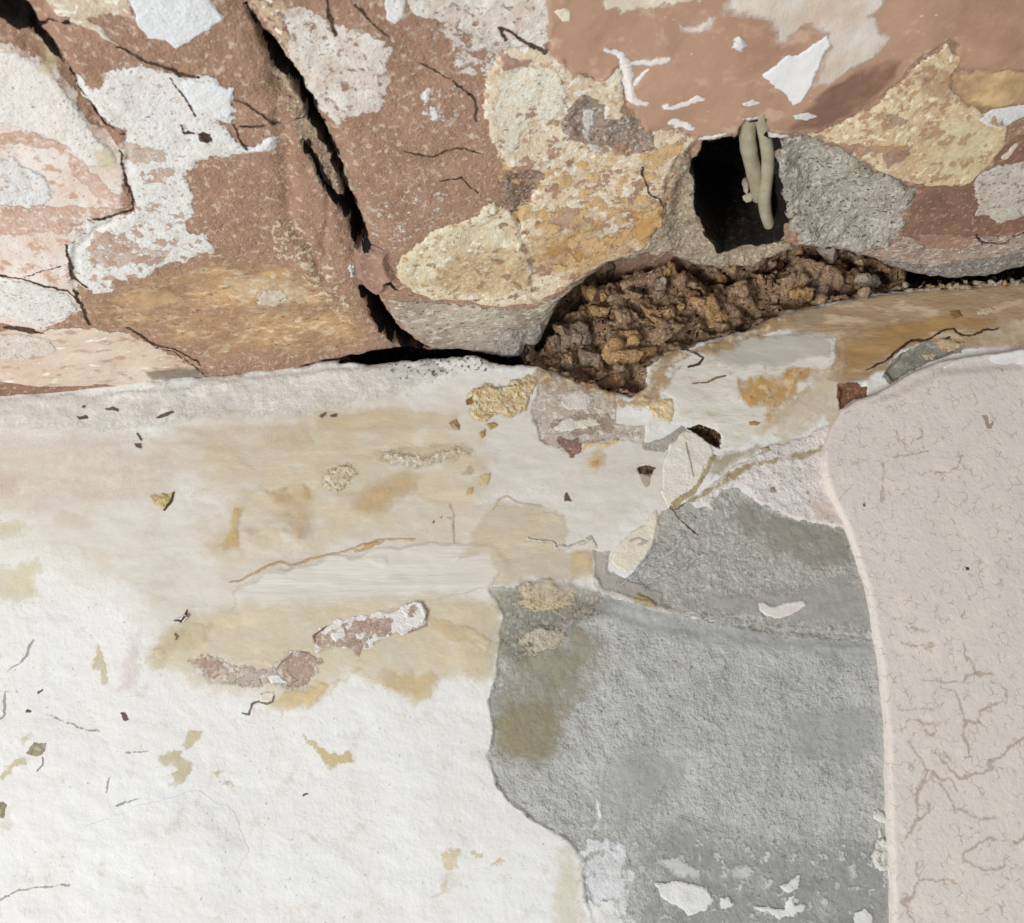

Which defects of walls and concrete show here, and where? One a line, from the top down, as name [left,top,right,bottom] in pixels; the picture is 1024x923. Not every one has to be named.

crack [326,0,389,37]
crack [497,27,548,55]
peeling [179,78,236,120]
peeling [793,113,817,121]
peeling [228,137,280,155]
spalling [466,132,1024,458]
crack [339,282,552,369]
crack [866,328,999,370]
crack [229,538,415,583]
damp [0,404,657,707]
peeling [187,600,428,716]
spalling [487,488,889,923]